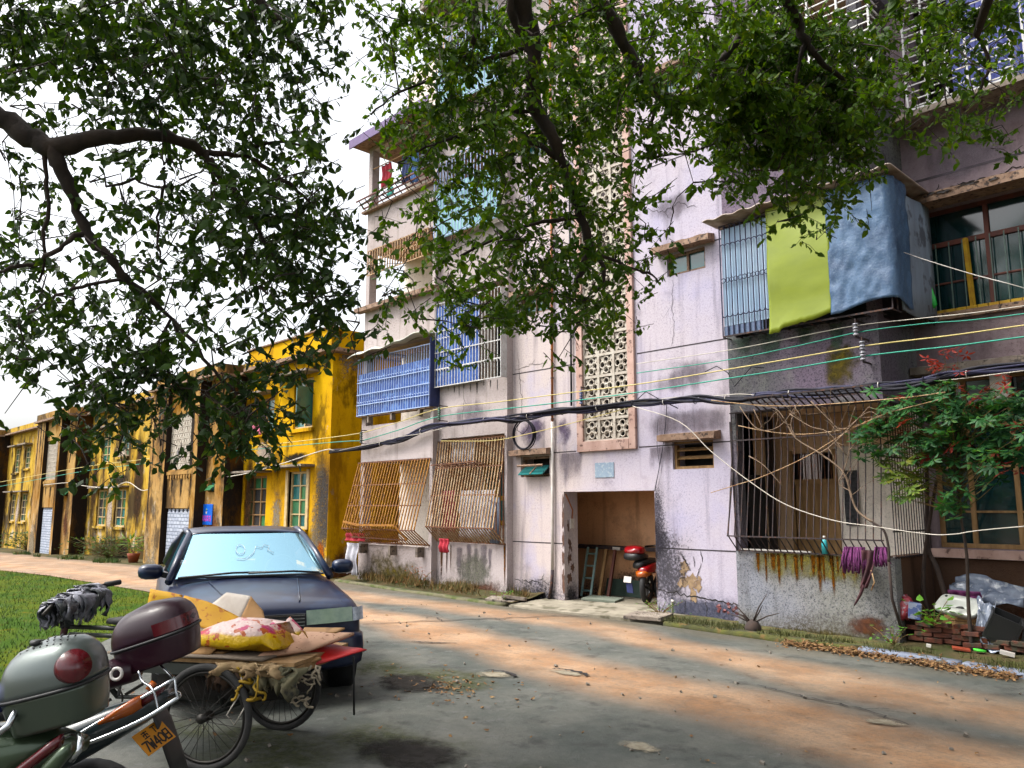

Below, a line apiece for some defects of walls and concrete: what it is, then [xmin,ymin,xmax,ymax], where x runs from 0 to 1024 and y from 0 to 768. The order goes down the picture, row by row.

water stain [617,489,735,621]
peeling [677,559,702,603]
rust [756,553,857,590]